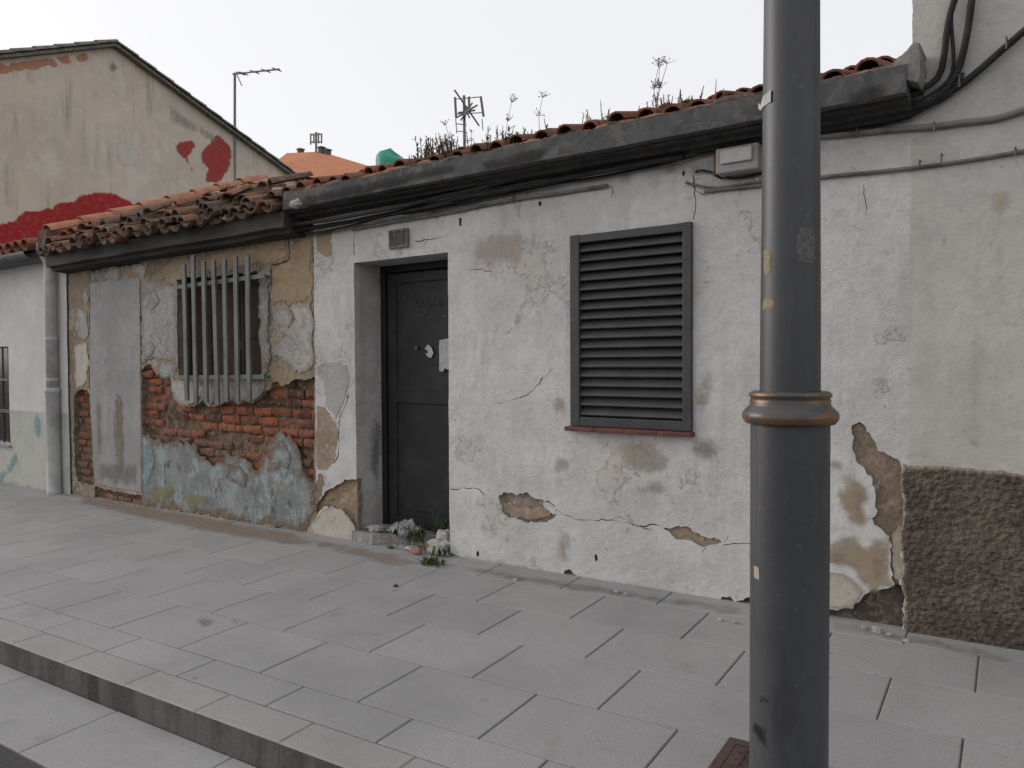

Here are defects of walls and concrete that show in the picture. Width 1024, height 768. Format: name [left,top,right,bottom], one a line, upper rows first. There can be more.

flaking render [73,261,349,505]
spalling [317,478,363,530]
spalling [498,492,557,523]
crack [562,513,659,530]
spalling [830,422,905,627]